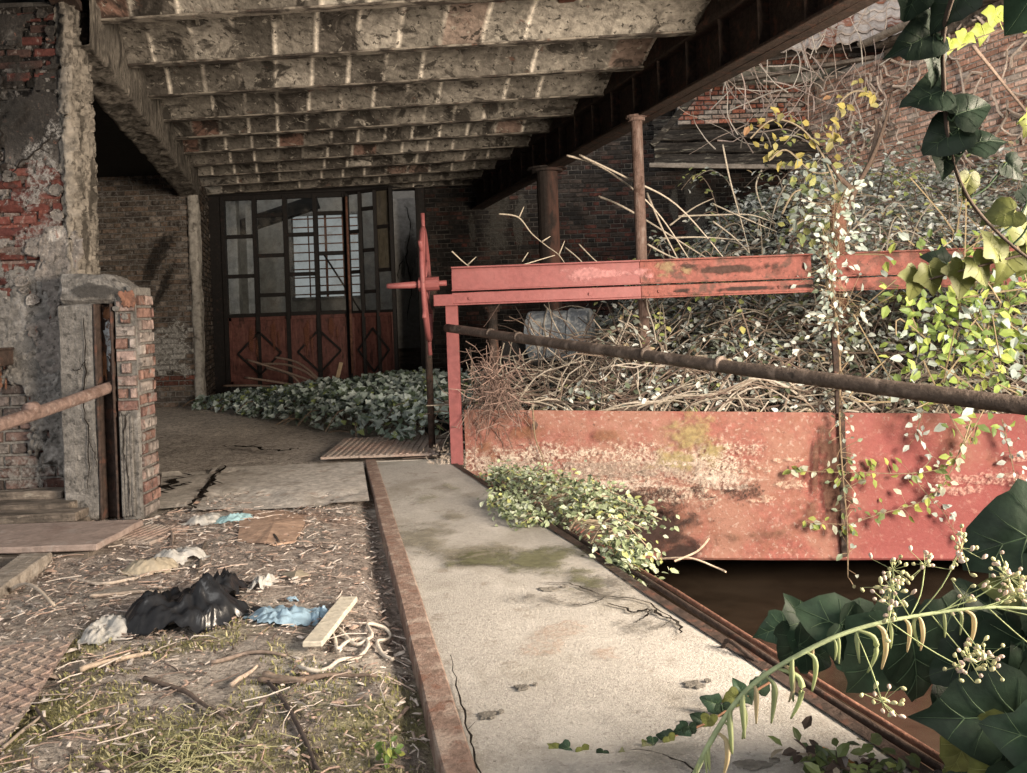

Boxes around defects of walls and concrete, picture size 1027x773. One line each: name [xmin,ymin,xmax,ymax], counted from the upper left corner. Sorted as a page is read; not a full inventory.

peeling [0,9,85,375]
crack [161,443,299,508]
rust [584,484,765,559]
rust [807,426,852,527]
crack [547,582,683,633]
crack [450,655,481,773]